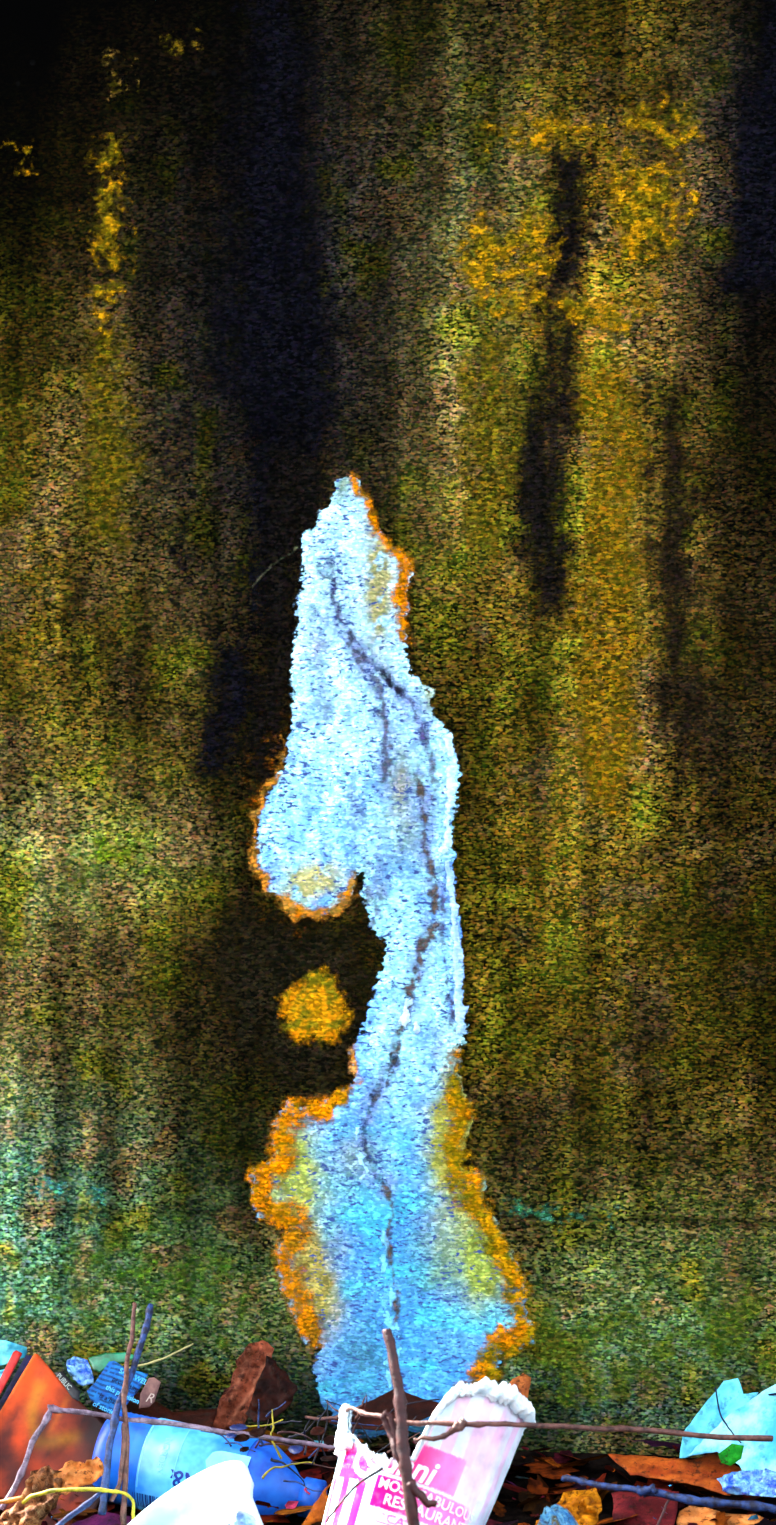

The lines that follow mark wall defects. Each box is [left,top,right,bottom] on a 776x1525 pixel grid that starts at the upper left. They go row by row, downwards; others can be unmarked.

leakage [510,145,597,614]
rust [247,967,363,1347]
crack [254,546,456,1322]